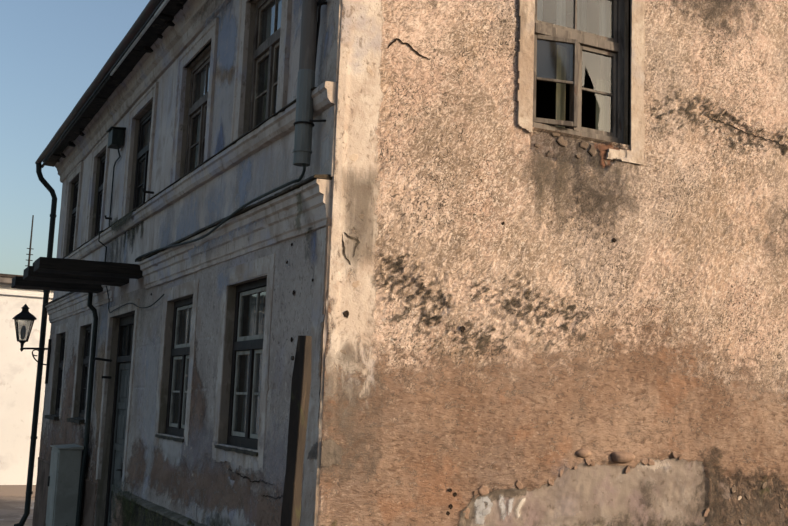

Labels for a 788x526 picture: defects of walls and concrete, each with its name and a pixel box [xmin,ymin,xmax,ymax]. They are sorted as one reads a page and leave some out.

crack [387,38,430,60]
crack [341,232,360,264]
peeling [307,0,788,526]
leakage [427,319,515,355]
peeling [39,347,93,479]
peeling [125,341,287,526]